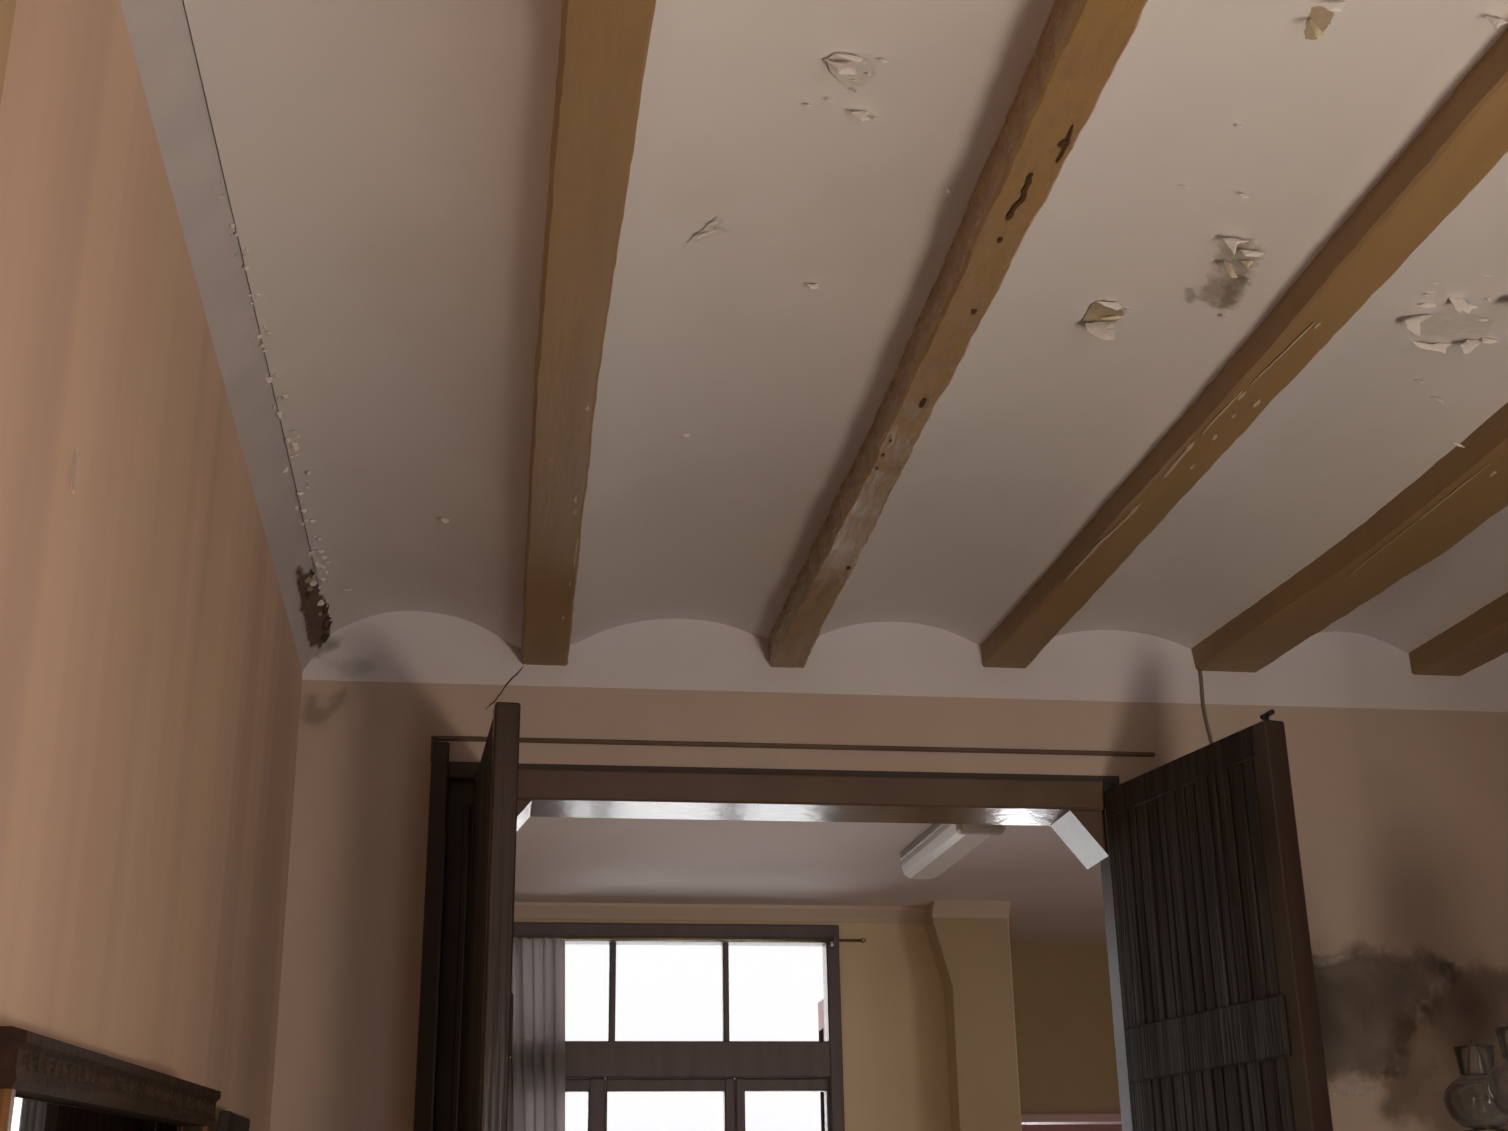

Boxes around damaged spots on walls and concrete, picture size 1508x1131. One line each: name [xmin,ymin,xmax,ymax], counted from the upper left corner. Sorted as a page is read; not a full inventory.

peeling [1304,2,1346,40]
peeling [824,53,888,93]
peeling [1205,238,1264,320]
peeling [1082,300,1131,341]
peeling [1405,282,1499,354]
leakage [297,562,333,648]